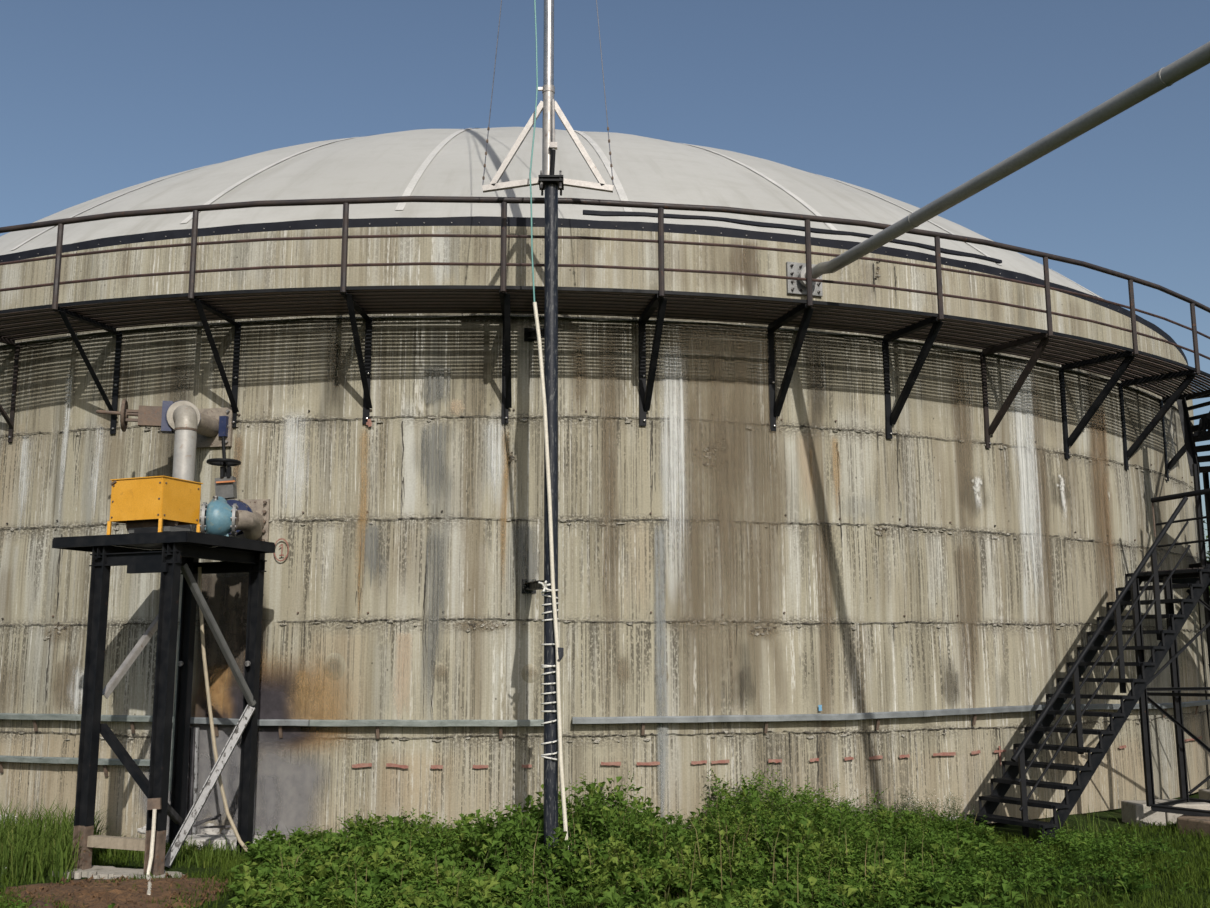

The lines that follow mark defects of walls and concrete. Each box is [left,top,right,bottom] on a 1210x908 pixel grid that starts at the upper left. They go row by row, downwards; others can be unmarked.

damp [20,442,28,507]
damp [61,382,71,487]
damp [971,478,982,502]
damp [1016,374,1042,556]